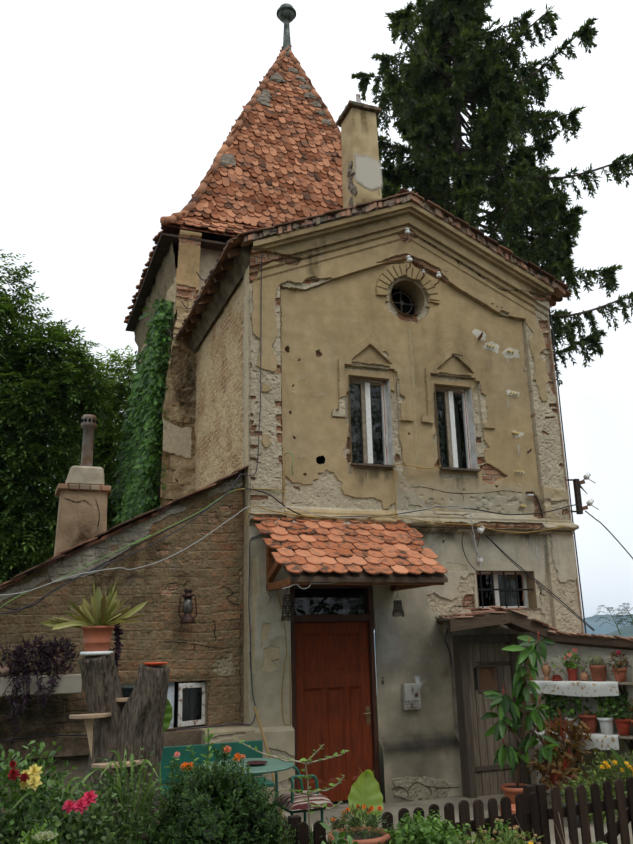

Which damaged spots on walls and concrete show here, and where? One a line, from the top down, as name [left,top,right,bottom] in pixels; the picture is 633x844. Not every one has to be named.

spalling [170,345,196,402]
spalling [210,245,434,741]
spalling [427,573,476,649]
spalling [434,300,582,635]